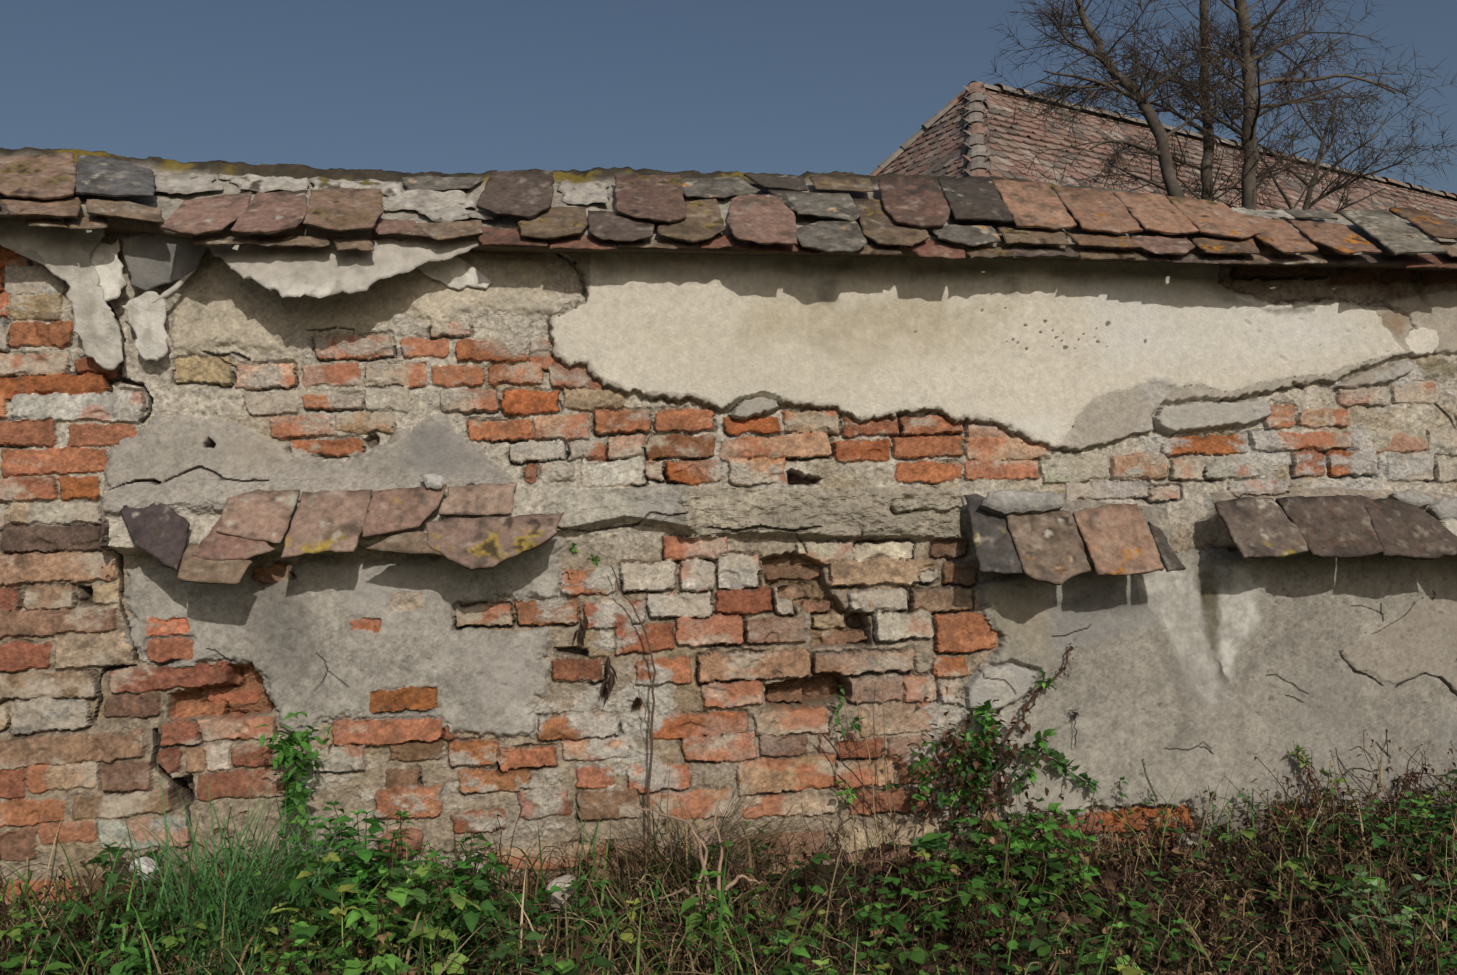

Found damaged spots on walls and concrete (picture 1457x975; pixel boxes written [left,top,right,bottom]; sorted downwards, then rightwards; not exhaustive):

crack [112,465,270,489]
spalling [0,220,1457,888]
water stain [1139,566,1260,704]
crack [1339,590,1457,696]